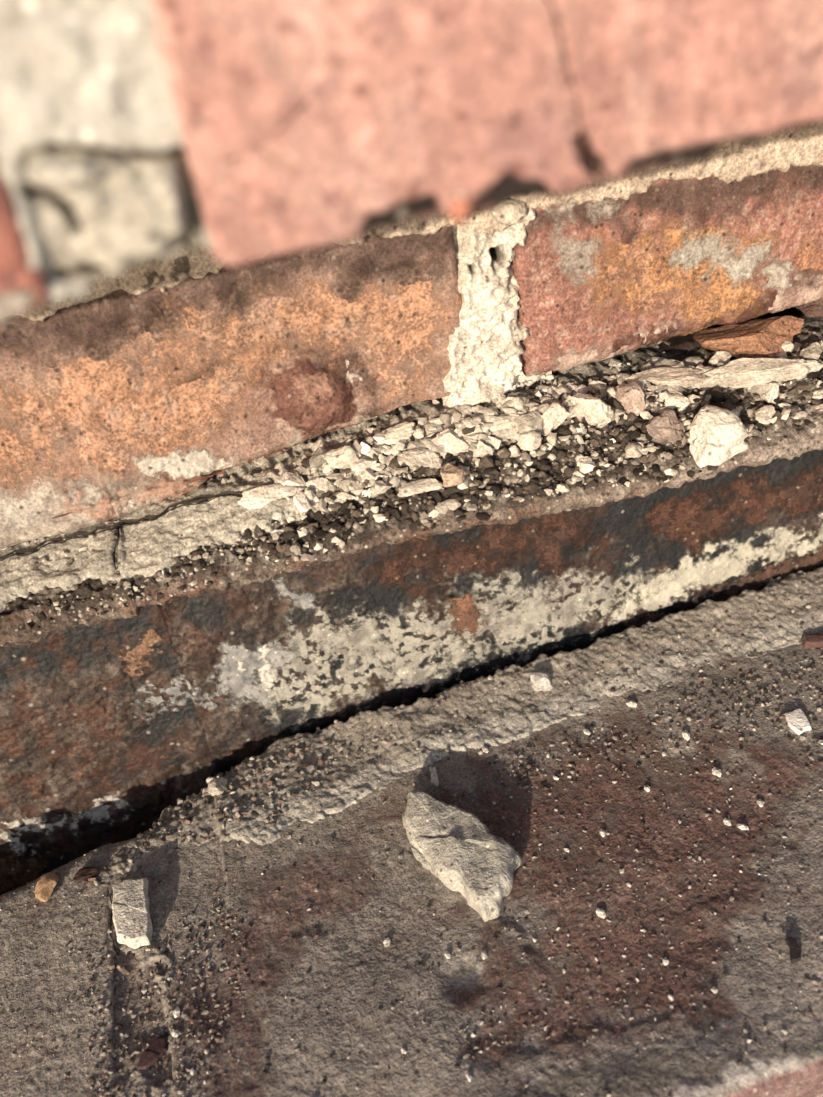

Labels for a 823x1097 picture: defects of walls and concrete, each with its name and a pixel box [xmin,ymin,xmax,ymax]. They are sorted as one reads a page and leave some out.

crack [0,425,352,570]
corrosion [646,463,823,556]
corrosion [367,511,609,637]
corrosion [703,544,823,602]
corrosion [118,629,163,677]
peeling [257,513,823,735]
corrosion [623,605,666,628]
corrosion [0,854,51,894]
corrosion [73,867,99,882]